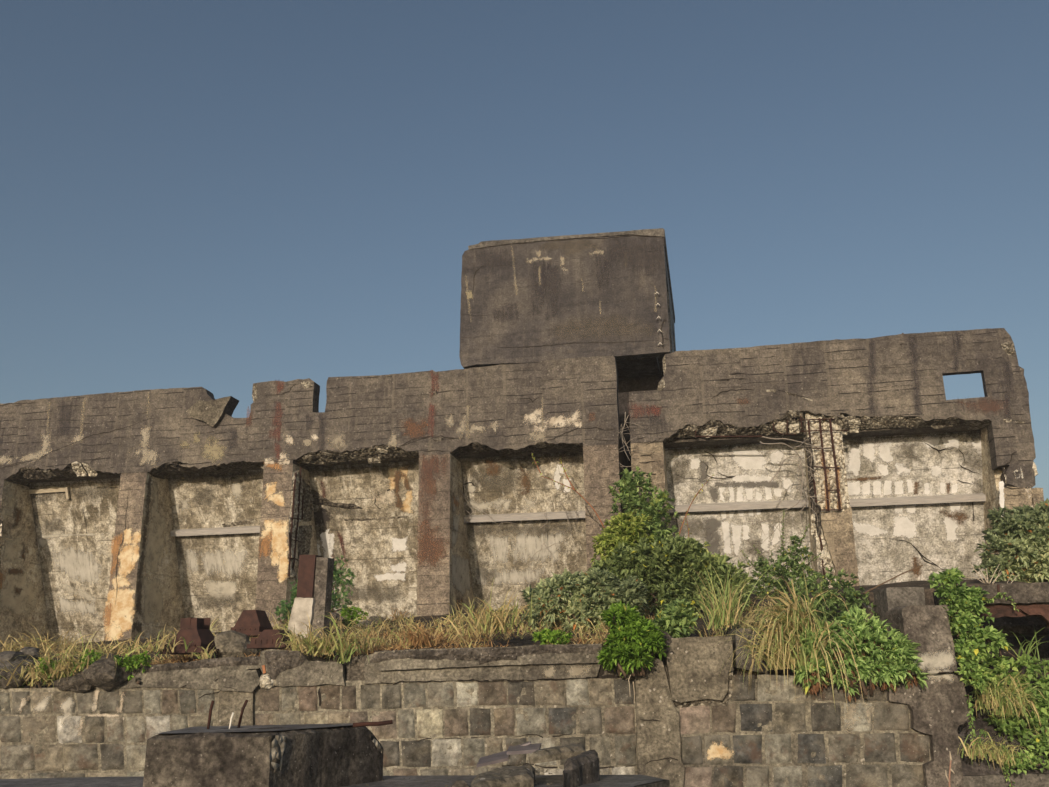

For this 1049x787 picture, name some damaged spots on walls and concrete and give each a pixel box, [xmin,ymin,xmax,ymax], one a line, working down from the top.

leakage [0,503,104,614]
peeling [104,480,166,641]
rust [260,531,272,556]
peeling [222,454,408,583]
leakage [673,518,721,553]
leakage [668,444,779,502]
peeling [699,426,793,555]
spalling [766,389,961,588]
crack [893,539,946,571]
peeling [922,419,982,456]
crack [925,443,1021,521]